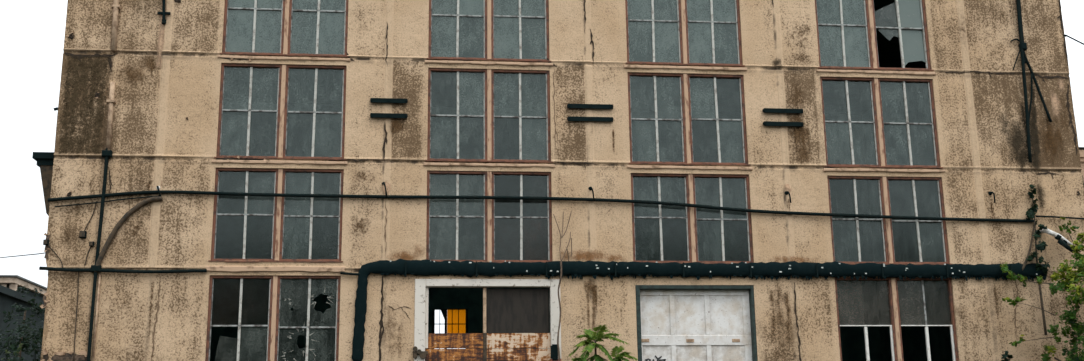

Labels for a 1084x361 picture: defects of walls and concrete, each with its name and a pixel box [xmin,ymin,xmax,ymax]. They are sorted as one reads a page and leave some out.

crack [584,0,594,63]
leakage [58,54,155,156]
leakage [789,85,810,162]
leakage [1001,89,1066,207]
spalling [41,349,91,361]
leakage [771,289,794,357]